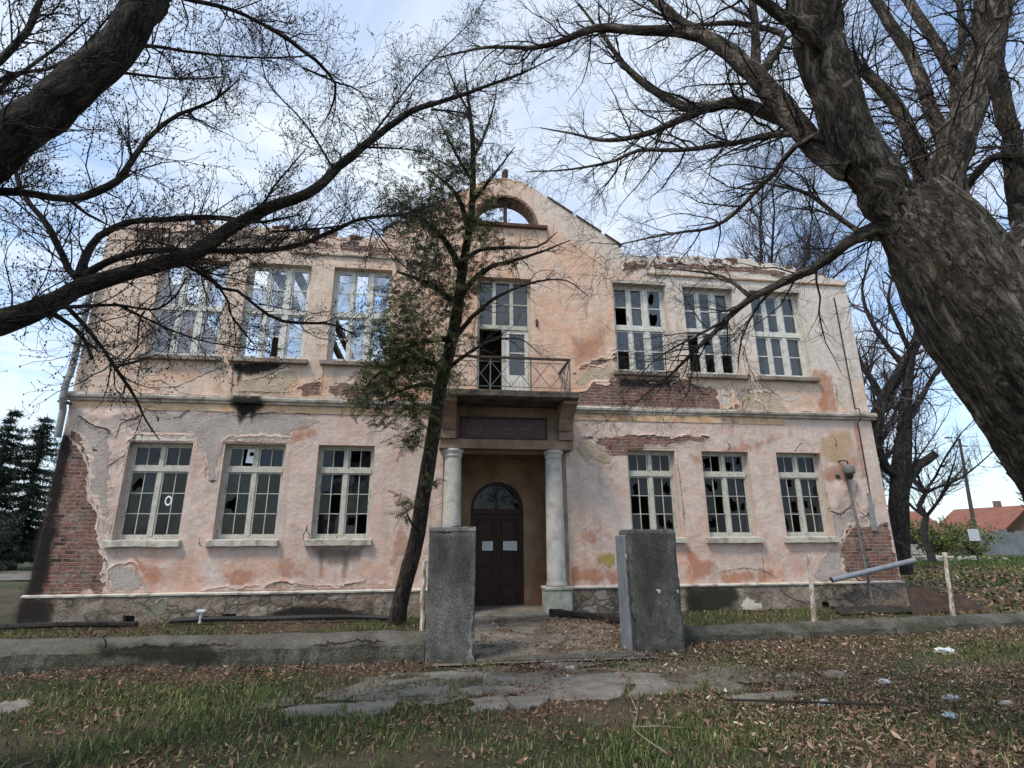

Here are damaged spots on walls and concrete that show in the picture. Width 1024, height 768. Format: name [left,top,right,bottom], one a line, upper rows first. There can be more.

flaking render [615,254,797,283]
damp [233,363,280,381]
flaking render [228,364,390,400]
damp [229,395,264,421]
flaking render [563,346,837,473]
flaking render [31,410,330,623]
flaking render [807,503,901,581]